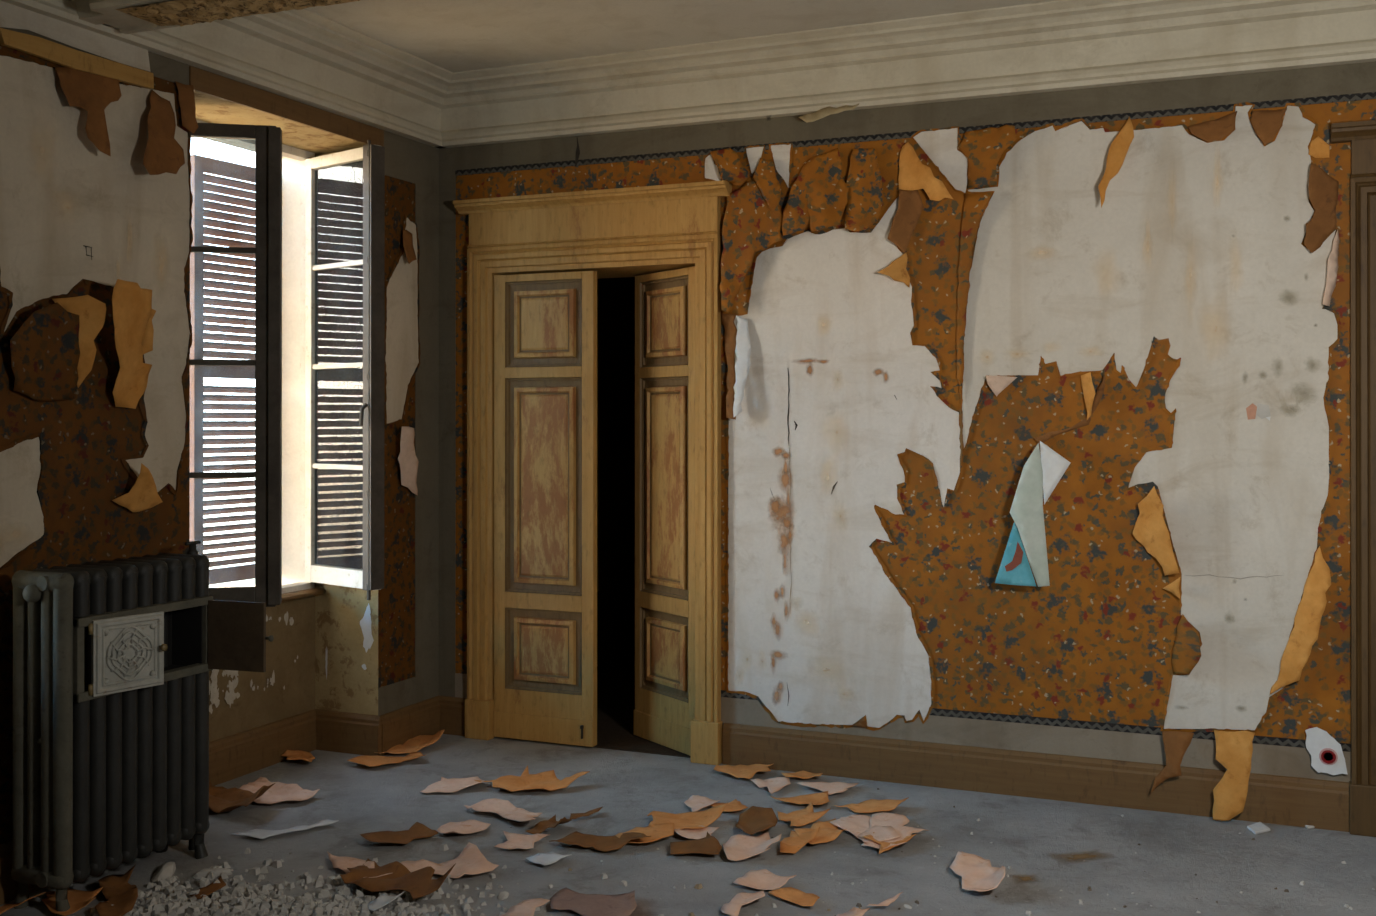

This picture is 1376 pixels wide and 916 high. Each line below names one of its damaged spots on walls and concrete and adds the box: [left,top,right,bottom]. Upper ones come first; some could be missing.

flaking render [115,0,360,26]
peeling [0,1,198,512]
peeling [384,214,421,495]
peeling [0,432,48,571]
peeling [703,102,1341,821]
peeling [209,669,285,714]
peeling [360,603,374,670]